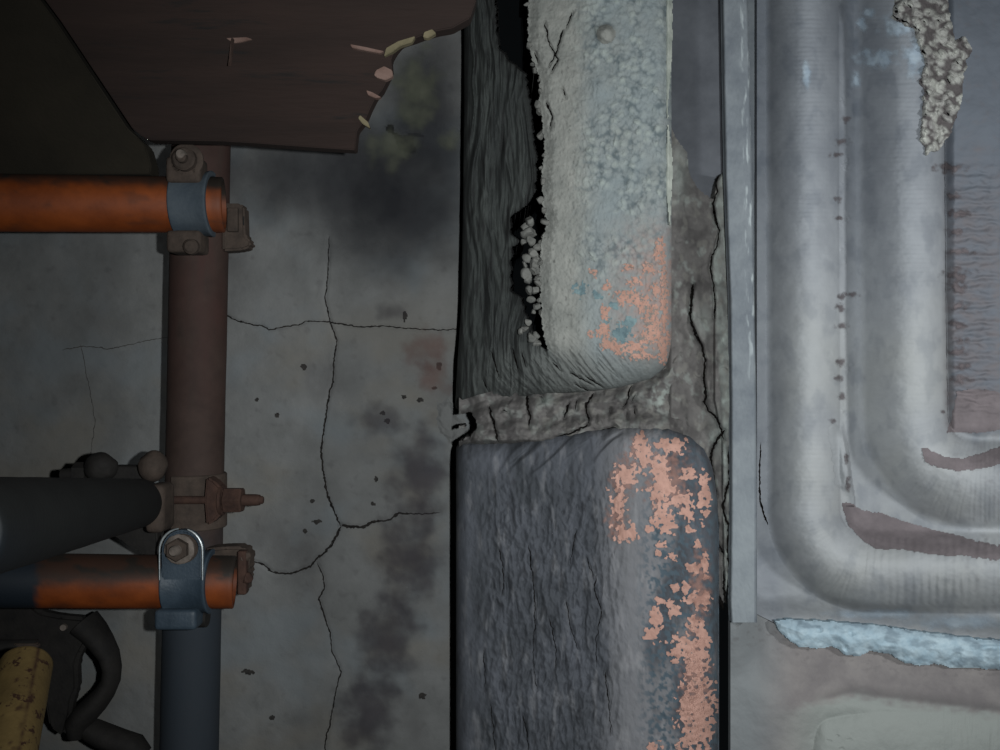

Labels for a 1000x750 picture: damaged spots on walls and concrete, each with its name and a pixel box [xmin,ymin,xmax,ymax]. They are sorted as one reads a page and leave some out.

spalling [530,62,543,116]
spalling [891,0,972,156]
spalling [518,153,550,346]
crack [64,337,167,455]
crack [227,239,459,750]
crack [470,348,542,440]
crack [553,363,636,437]
crack [688,174,730,610]
peeling [842,502,1000,561]
peeling [922,446,1000,471]